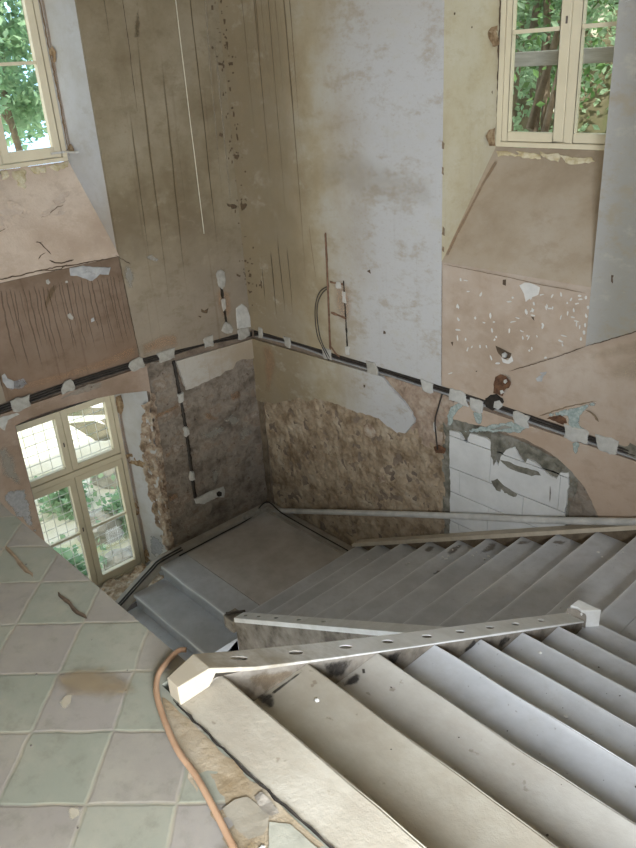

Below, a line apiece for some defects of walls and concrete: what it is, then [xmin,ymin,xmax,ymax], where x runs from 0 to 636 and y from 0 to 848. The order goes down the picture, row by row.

crack [0,241,140,354]
spalling [451,304,513,364]
peeling [509,283,589,352]
peeling [465,374,525,433]
peeling [540,401,595,429]
flaking render [125,359,463,551]